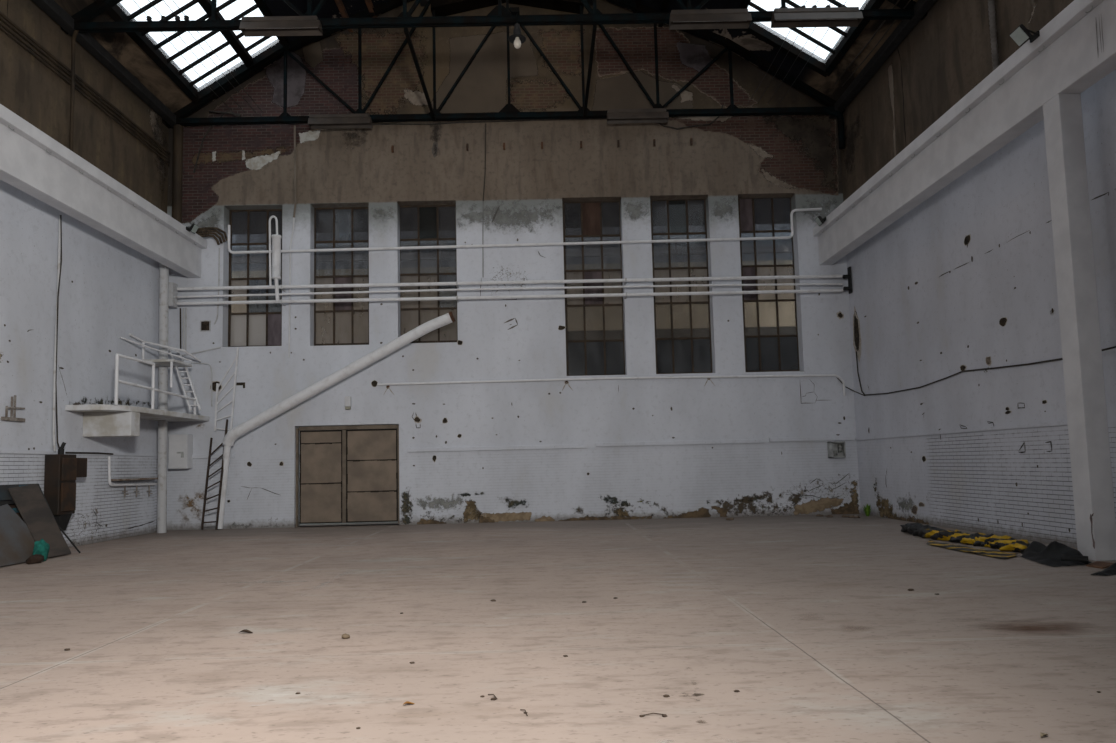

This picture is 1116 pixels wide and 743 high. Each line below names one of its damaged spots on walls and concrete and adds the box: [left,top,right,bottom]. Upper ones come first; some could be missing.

flaking render [182,28,428,224]
flaking render [510,26,839,196]
spalling [479,506,728,523]
spalling [745,473,859,515]
spalling [889,497,929,525]